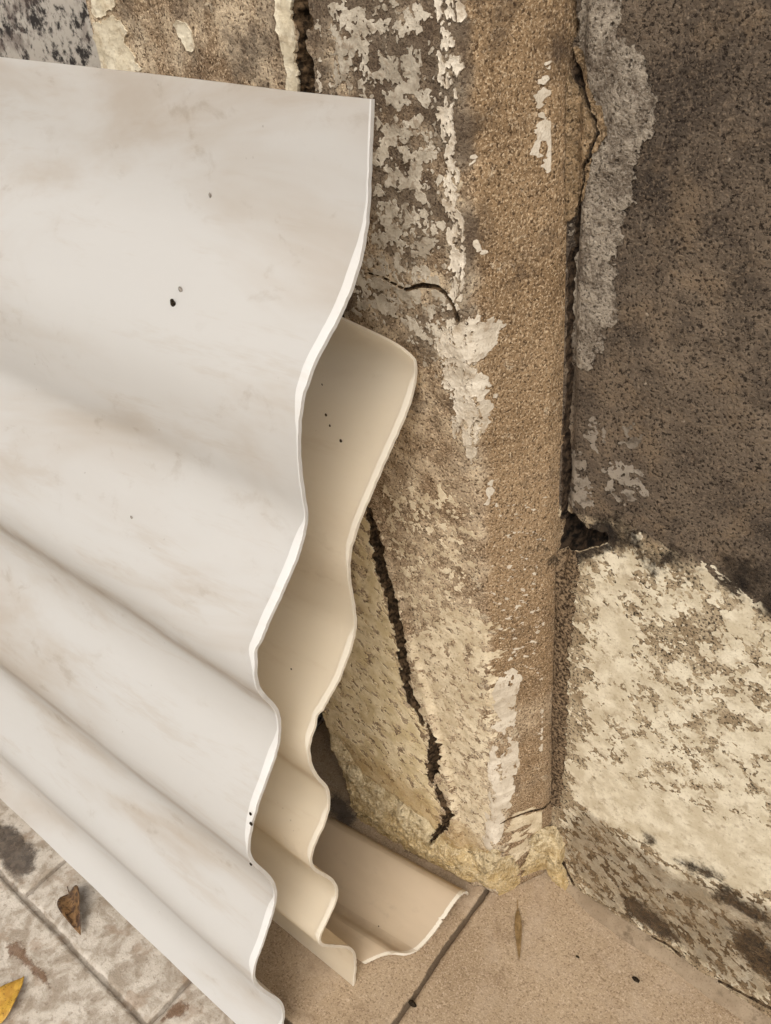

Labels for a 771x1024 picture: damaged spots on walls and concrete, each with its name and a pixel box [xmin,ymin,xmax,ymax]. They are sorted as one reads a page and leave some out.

peeling [91,0,142,72]
peeling [173,20,195,52]
crack [292,0,315,93]
peeling [314,0,506,464]
crack [368,272,460,322]
crack [560,63,600,519]
crack [366,506,455,843]
peeling [322,416,771,1004]